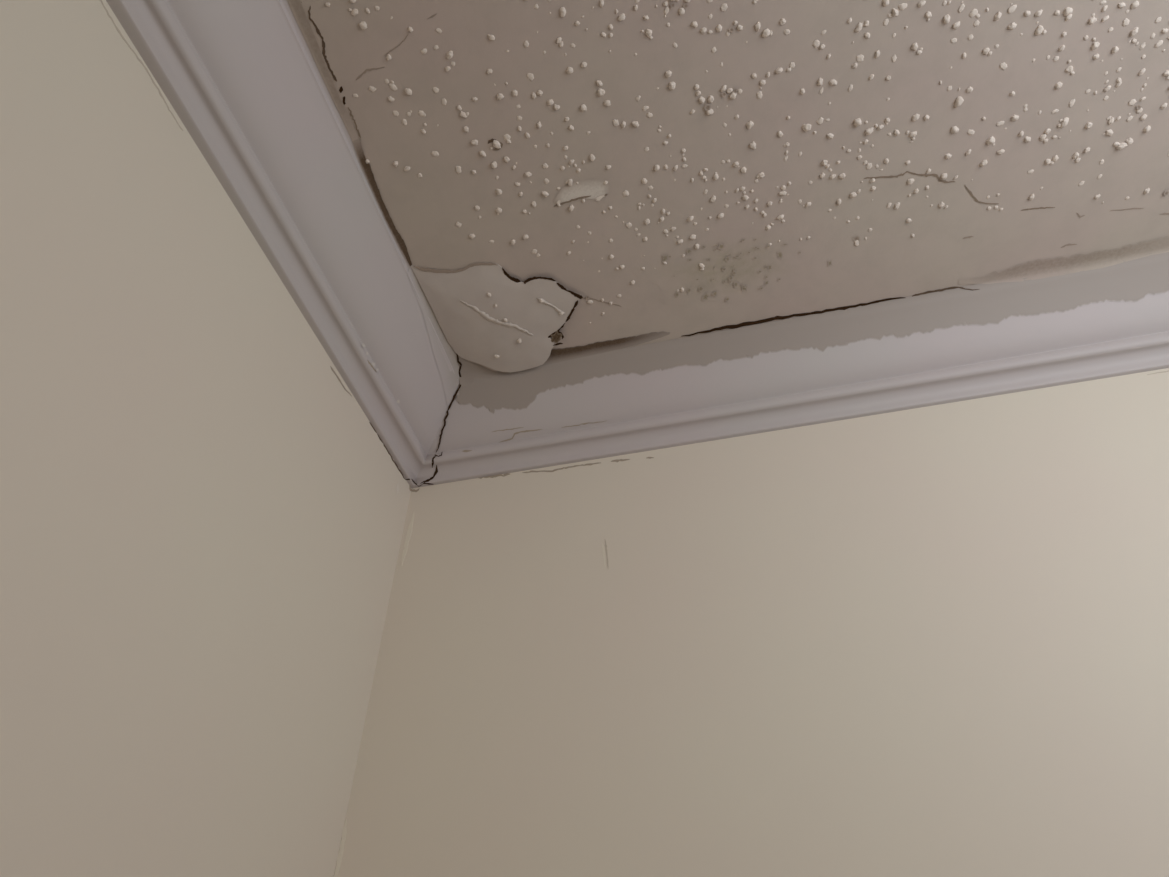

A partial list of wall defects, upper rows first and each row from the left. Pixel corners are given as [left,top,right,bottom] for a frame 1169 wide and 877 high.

crack [301,2,436,138]
crack [502,267,622,346]
crack [683,287,979,336]
crack [369,353,462,487]